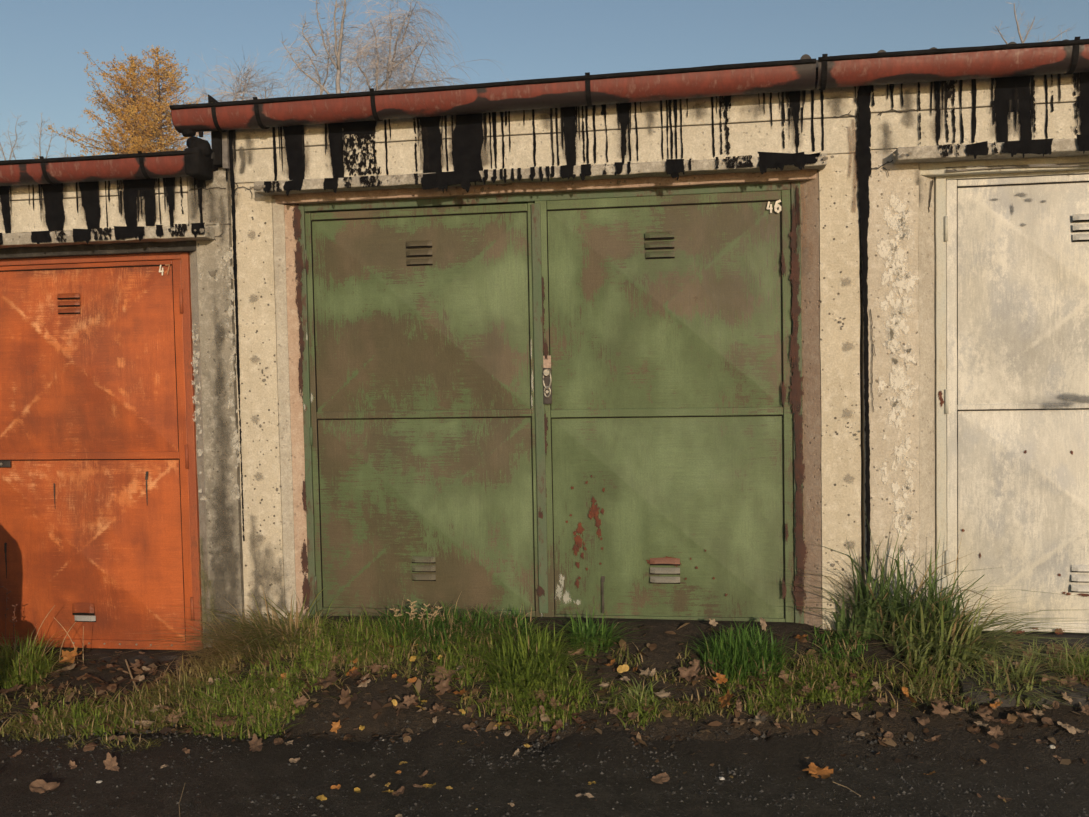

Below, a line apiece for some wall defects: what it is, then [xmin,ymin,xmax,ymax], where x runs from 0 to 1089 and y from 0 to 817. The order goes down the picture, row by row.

leakage [272,125,307,181]
leakage [327,119,391,178]
leakage [413,111,511,173]
leakage [523,104,608,167]
leakage [619,95,731,162]
leakage [755,90,841,153]
leakage [935,79,977,146]
leakage [991,72,1089,143]
leakage [28,183,66,231]
leakage [79,130,285,644]
peeling [876,193,919,602]
rust [566,488,605,613]